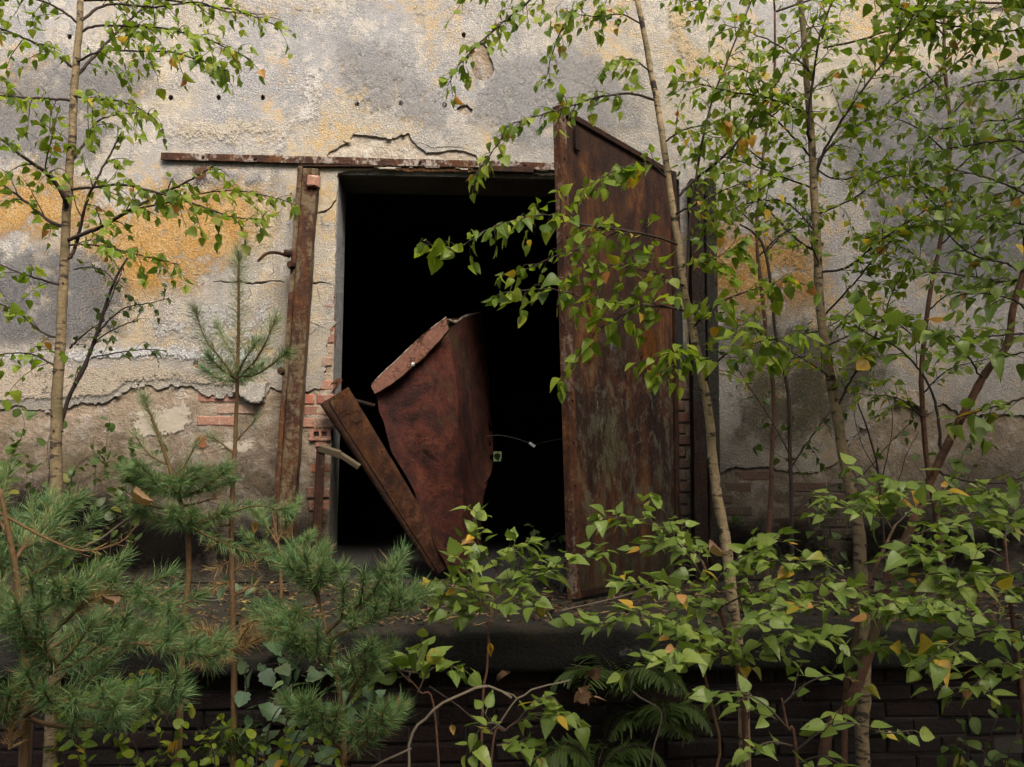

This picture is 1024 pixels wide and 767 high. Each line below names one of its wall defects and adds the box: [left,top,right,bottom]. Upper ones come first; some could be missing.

flaking render [0,292,336,583]
rust [639,324,664,371]